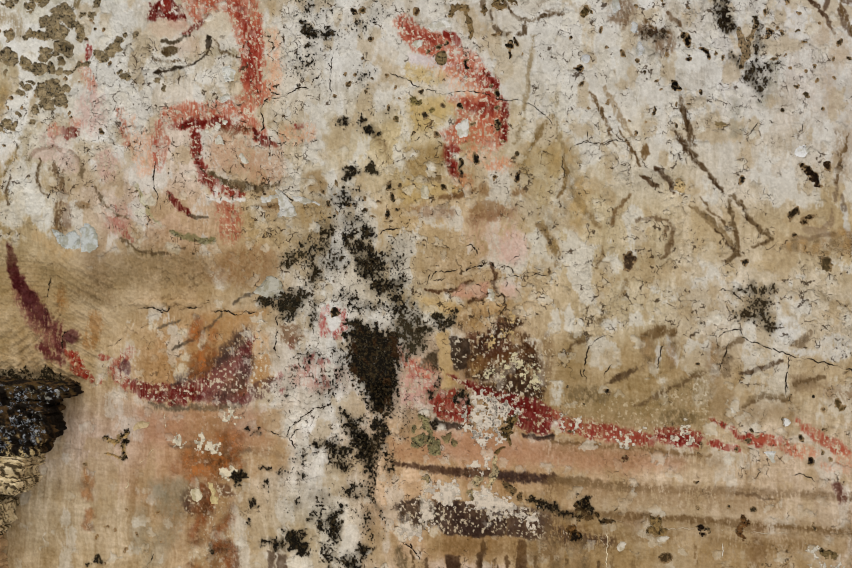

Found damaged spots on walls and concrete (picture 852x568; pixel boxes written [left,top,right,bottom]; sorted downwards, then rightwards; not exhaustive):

damp [713,0,737,34]
flaking render [0,0,139,134]
damp [728,16,781,103]
flaking render [52,223,98,253]
crack [0,0,410,469]
flaking render [485,309,520,352]
damp [732,282,781,336]
damp [256,156,459,568]
flaking render [483,352,541,391]
flaking render [392,389,540,542]
flaking render [559,413,584,435]
flaking render [613,426,647,462]